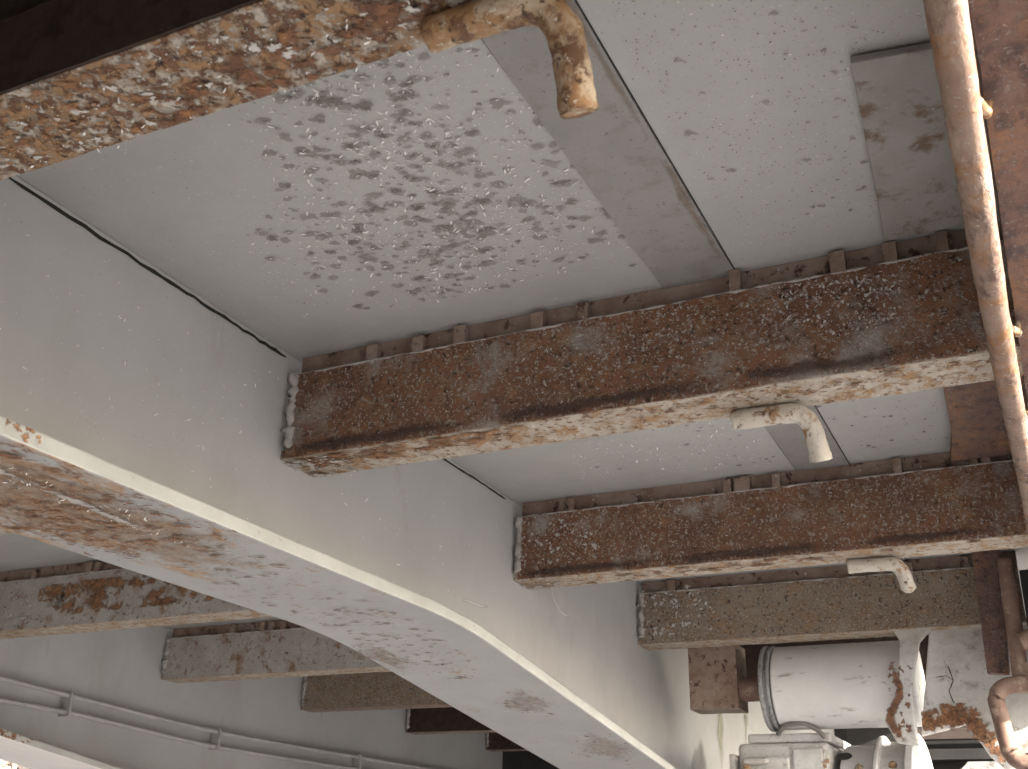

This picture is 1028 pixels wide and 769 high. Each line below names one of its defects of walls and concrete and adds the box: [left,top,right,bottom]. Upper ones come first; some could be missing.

rust [0,0,437,166]
crack [9,177,286,358]
rust [6,418,42,444]
rust [295,352,961,469]
rust [0,444,290,614]
rust [527,546,834,584]
rust [868,529,979,552]
rust [313,589,474,679]
rust [886,662,1006,763]